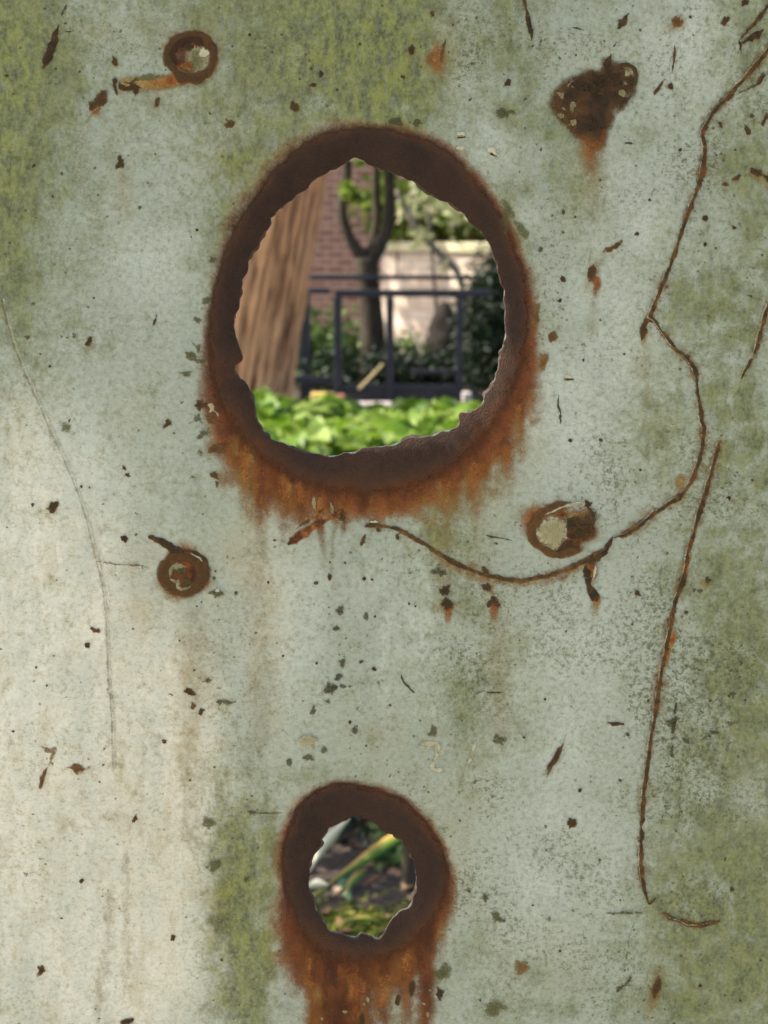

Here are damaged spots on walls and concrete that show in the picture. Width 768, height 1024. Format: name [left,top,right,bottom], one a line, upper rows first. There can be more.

corrosion [89,31,218,115]
corrosion [550,42,639,174]
corrosion [201,123,540,545]
corrosion [148,535,210,600]
corrosion [522,500,599,559]
crack [360,46,768,929]
corrosion [274,782,456,1024]